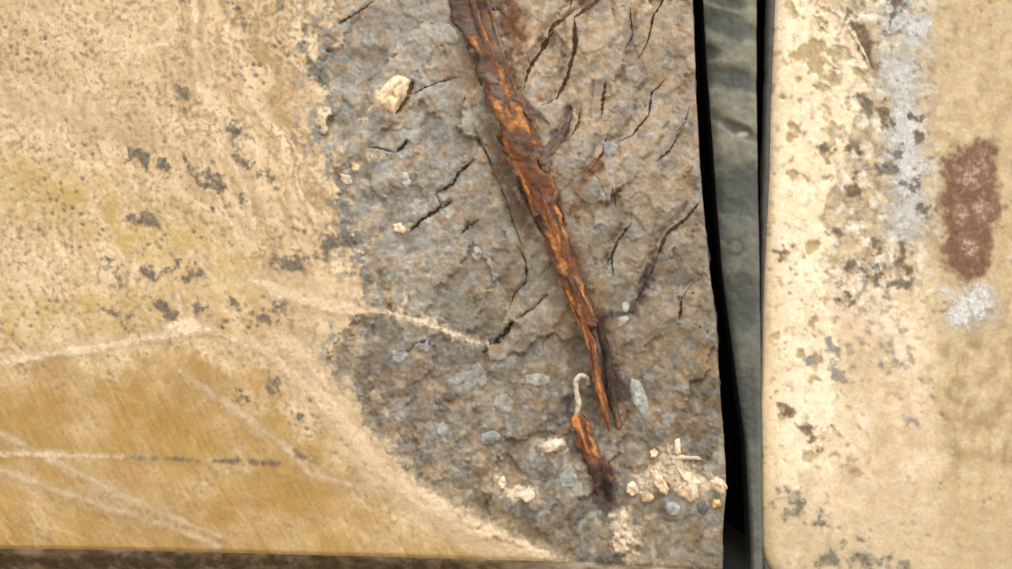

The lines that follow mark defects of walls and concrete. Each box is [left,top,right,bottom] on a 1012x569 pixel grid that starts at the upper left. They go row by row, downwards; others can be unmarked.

crack [624,0,684,60]
crack [395,77,457,115]
corrosion [467,0,573,172]
crack [520,0,666,170]
corrosion [506,157,539,216]
leakage [816,143,860,155]
leakage [834,0,934,307]
crack [409,126,548,345]
spalling [313,0,727,569]
corrosion [559,249,657,332]
leakage [939,283,998,329]
corrosion [560,395,574,423]